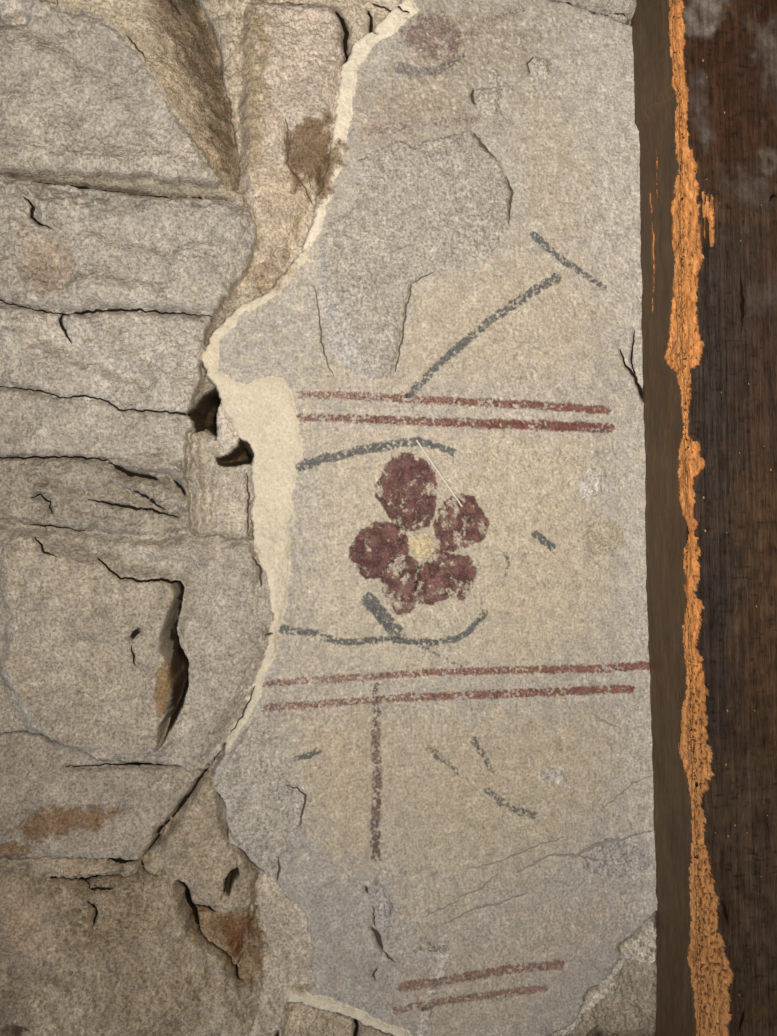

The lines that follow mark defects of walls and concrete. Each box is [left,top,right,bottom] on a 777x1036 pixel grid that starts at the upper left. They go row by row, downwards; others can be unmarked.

spalling [0,0,58,24]
damp [159,0,269,171]
damp [284,113,347,208]
spalling [2,535,182,758]
peeling [213,718,306,885]
spalling [185,887,264,990]